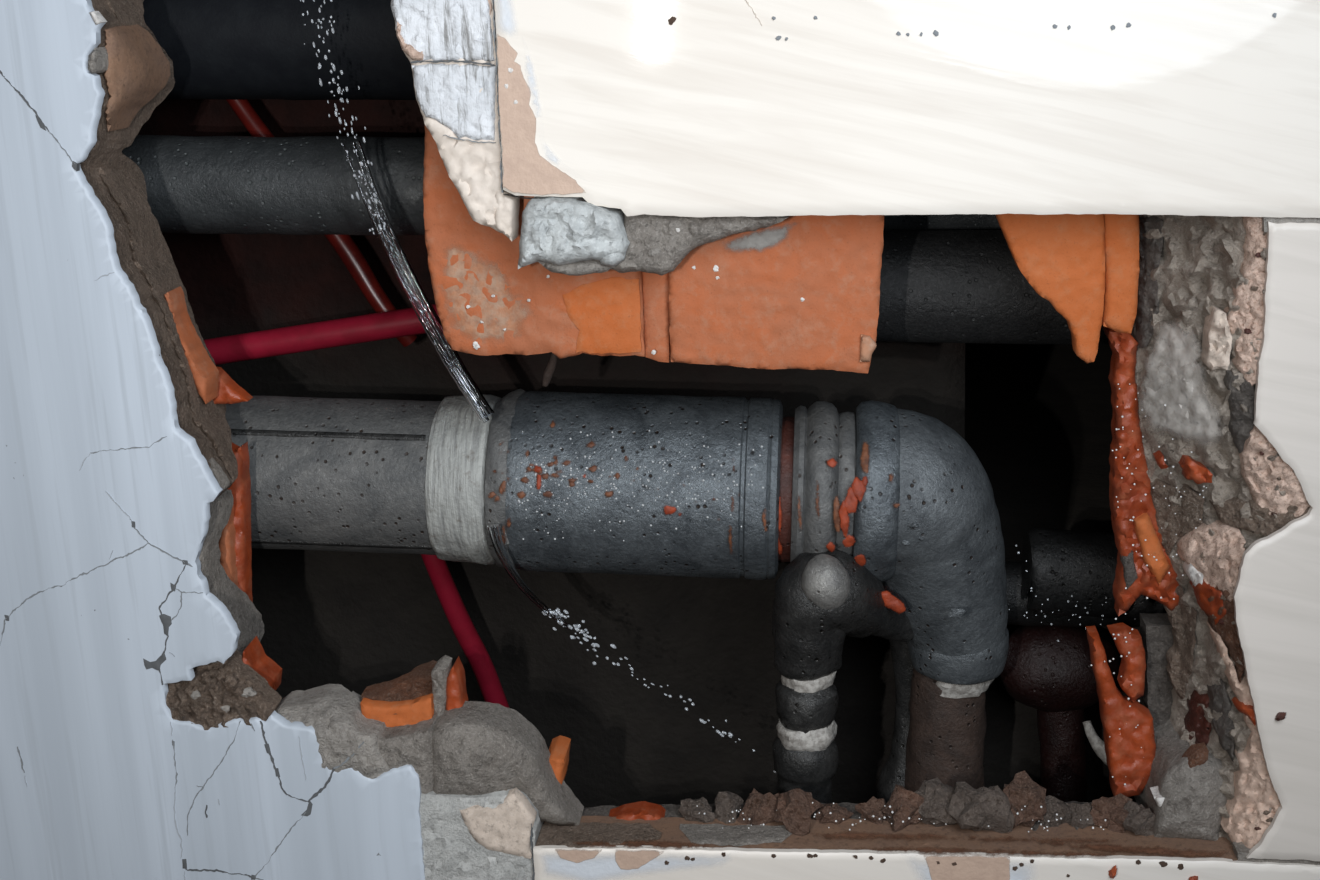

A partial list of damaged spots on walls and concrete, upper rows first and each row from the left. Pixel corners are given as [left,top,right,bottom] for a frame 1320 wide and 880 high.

crack [0,70,80,171]
peeling [391,0,584,241]
crack [0,493,203,685]
crack [79,436,167,471]
spalling [80,0,390,779]
spalling [419,214,1310,880]
crack [170,721,364,880]